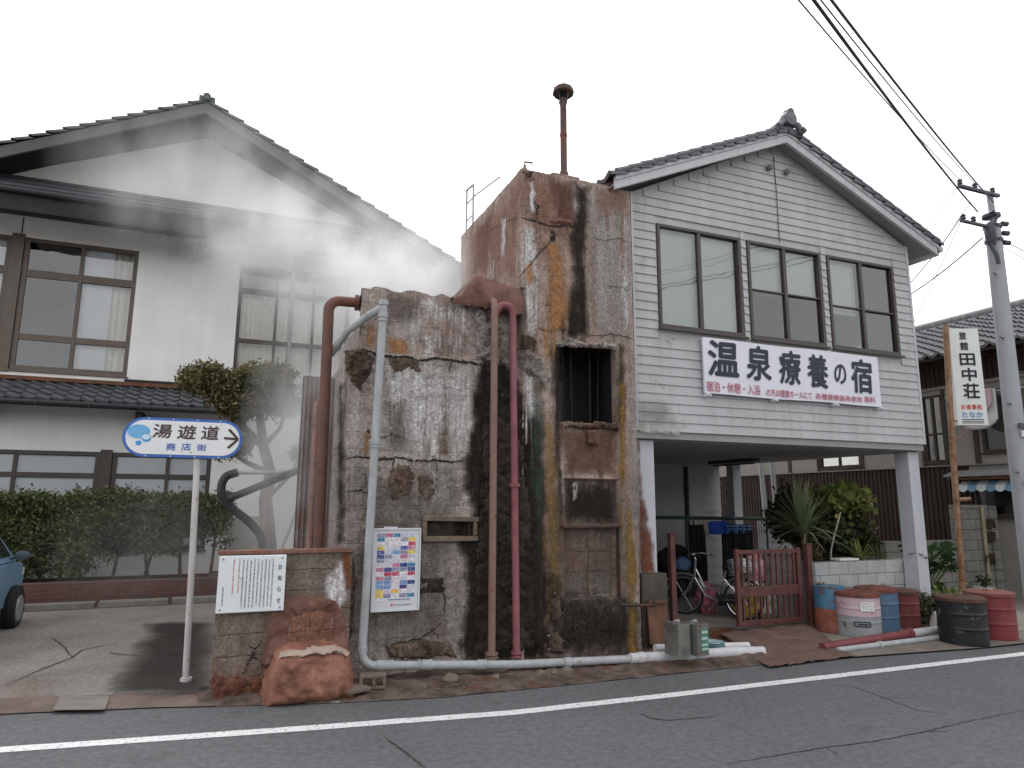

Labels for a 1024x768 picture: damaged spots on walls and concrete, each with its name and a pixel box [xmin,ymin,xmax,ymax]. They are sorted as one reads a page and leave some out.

crack [486,203,626,279]
spalling [345,348,422,392]
crack [343,348,487,380]
damp [386,182,655,660]
crack [348,432,463,494]
spalling [385,464,439,504]
crack [7,637,144,685]
spalling [385,638,457,660]